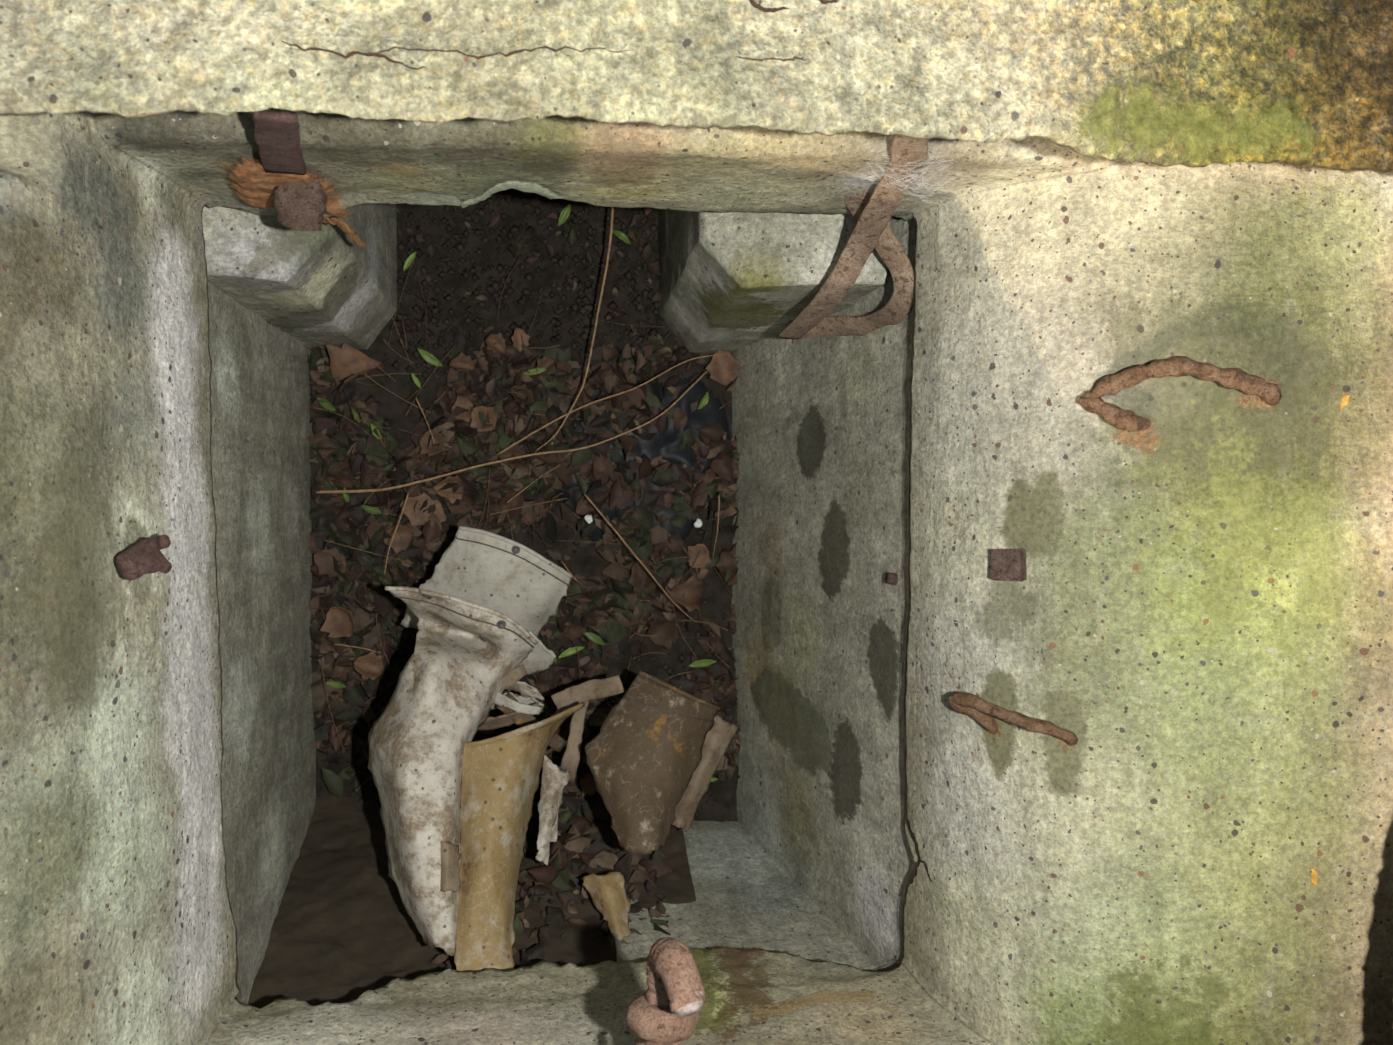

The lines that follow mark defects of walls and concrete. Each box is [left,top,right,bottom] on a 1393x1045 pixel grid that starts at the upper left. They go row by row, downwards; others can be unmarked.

crack [282,41,632,70]
crack [737,54,808,62]
crack [749,0,838,13]
damp [796,405,826,478]
corrosion [1114,419,1160,453]
damp [818,499,850,600]
damp [1000,473,1063,556]
damp [867,618,900,722]
crack [865,294,932,970]
damp [750,669,863,820]
damp [981,672,1017,778]
damp [1043,691,1087,796]